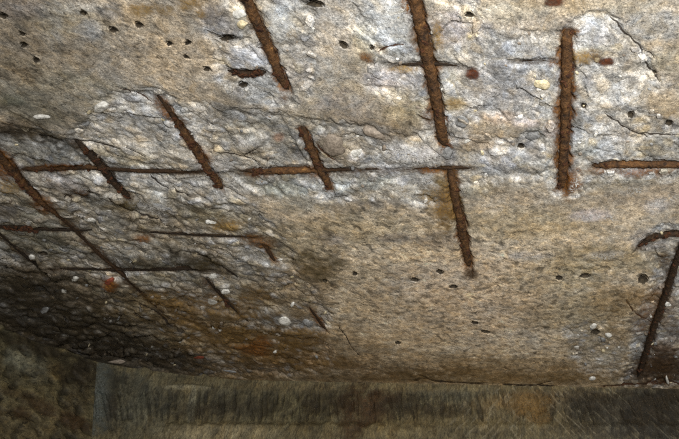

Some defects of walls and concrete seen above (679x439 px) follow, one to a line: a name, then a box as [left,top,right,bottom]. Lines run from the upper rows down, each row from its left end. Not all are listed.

corrosion [143,99,224,186]
corrosion [255,6,292,91]
corrosion [466,69,479,79]
corrosion [553,28,591,196]
crack [610,16,660,82]
corrosion [0,150,139,290]
spalling [0,87,337,379]
corrosion [168,222,278,262]
corrosion [417,165,475,279]